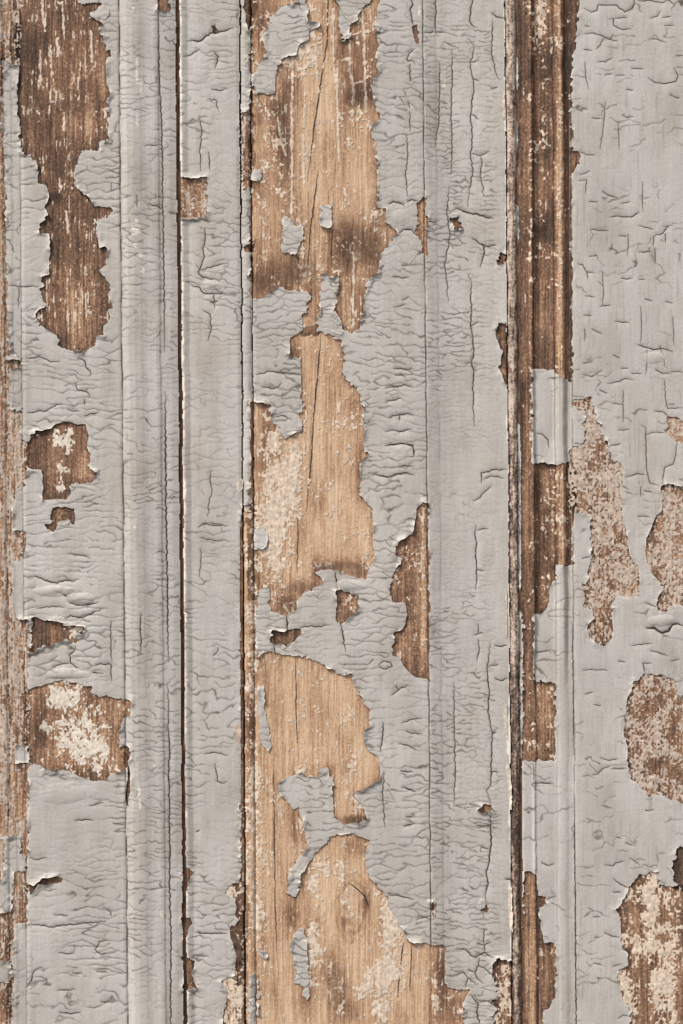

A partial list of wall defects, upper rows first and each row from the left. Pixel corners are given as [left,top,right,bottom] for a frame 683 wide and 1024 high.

peeling [0,0,132,1024]
crack [136,10,165,348]
crack [159,393,169,654]
peeling [180,177,208,220]
crack [167,687,226,1023]
peeling [221,0,470,1024]
crack [388,0,502,414]
crack [475,627,513,899]
peeling [496,0,683,810]
crack [541,602,683,747]
crack [580,0,683,517]
peeling [615,846,683,1024]